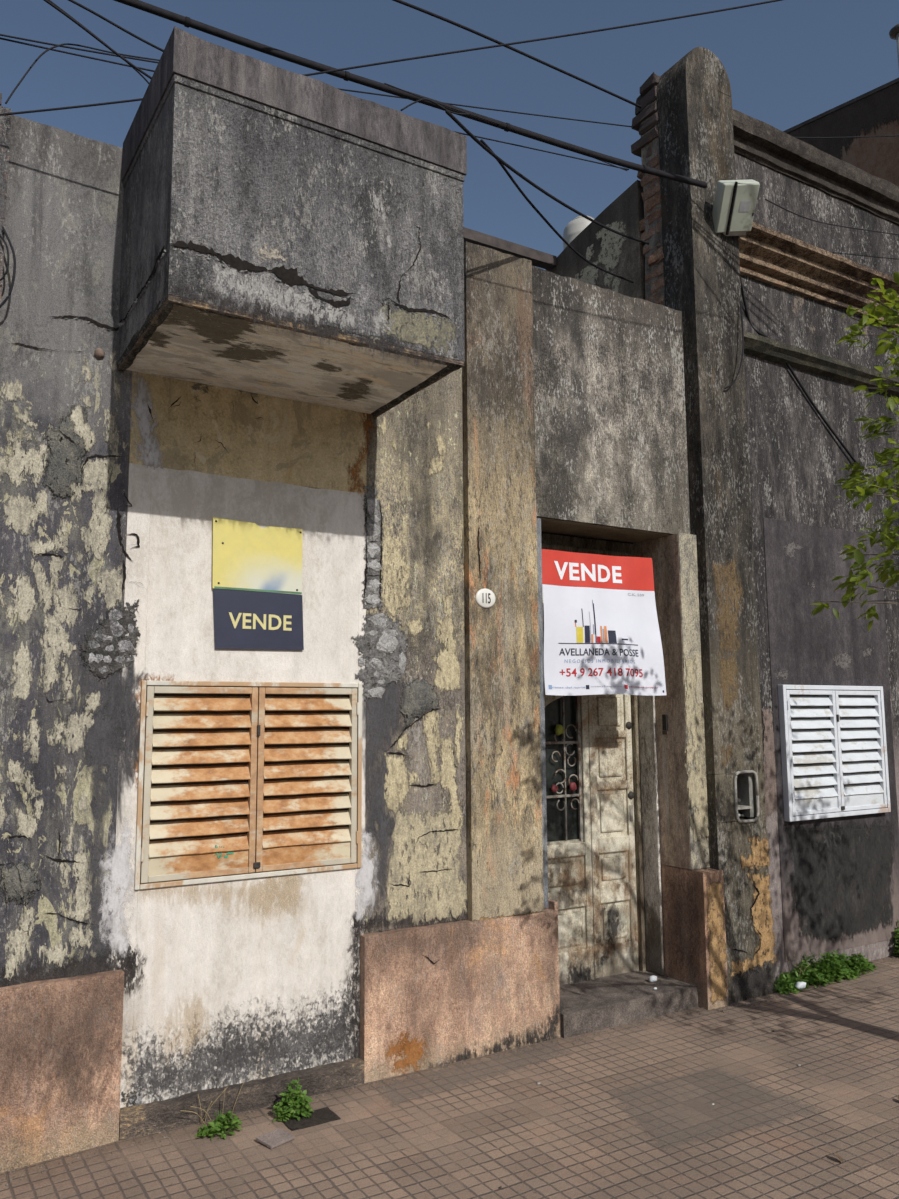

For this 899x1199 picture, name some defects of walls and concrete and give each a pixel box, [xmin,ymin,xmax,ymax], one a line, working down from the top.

crack [1,224,454,354]
leakage [139,244,457,365]
leakage [312,360,372,402]
peeling [0,350,161,841]
spalling [351,484,461,702]
corrosion [133,677,170,784]
crack [0,831,93,936]
peeling [0,795,135,981]
leakage [121,680,467,1105]
peeling [356,710,537,926]
peeling [706,836,778,1005]
corrosion [386,1032,425,1074]